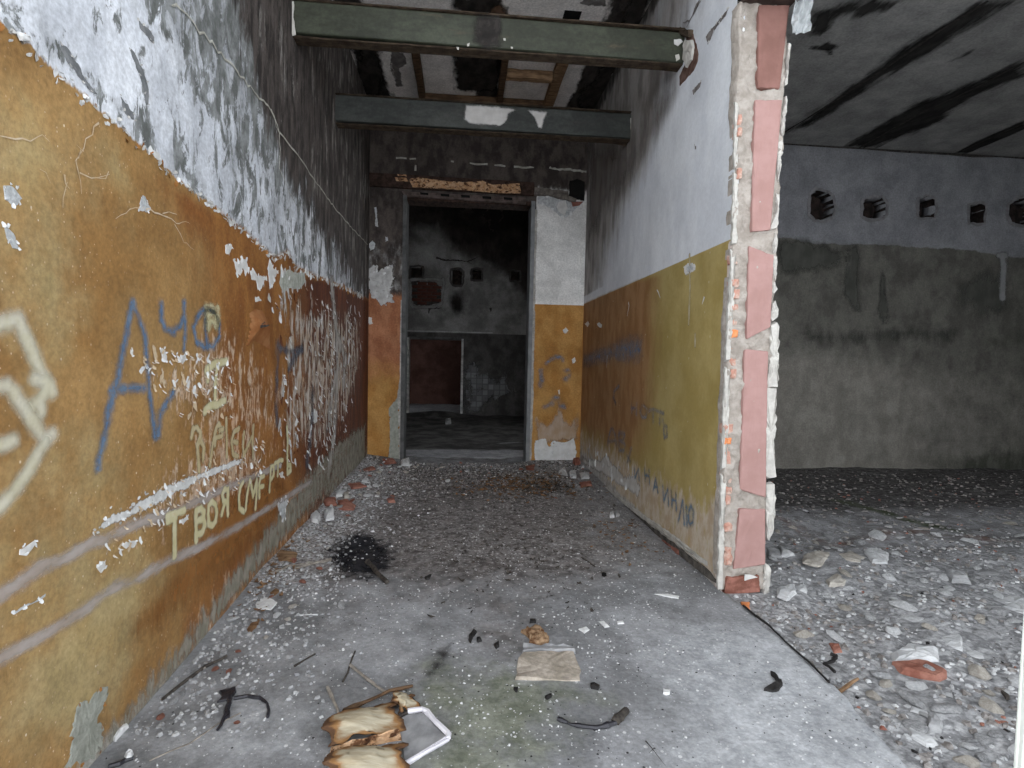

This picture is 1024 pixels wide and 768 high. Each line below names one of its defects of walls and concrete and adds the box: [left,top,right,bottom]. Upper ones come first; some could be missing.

peeling [390,52,406,87]
spalling [675,29,699,86]
crack [0,134,50,142]
crack [40,122,109,199]
crack [117,207,194,250]
peeling [0,22,395,479]
water stain [778,239,860,311]
spalling [64,686,129,768]